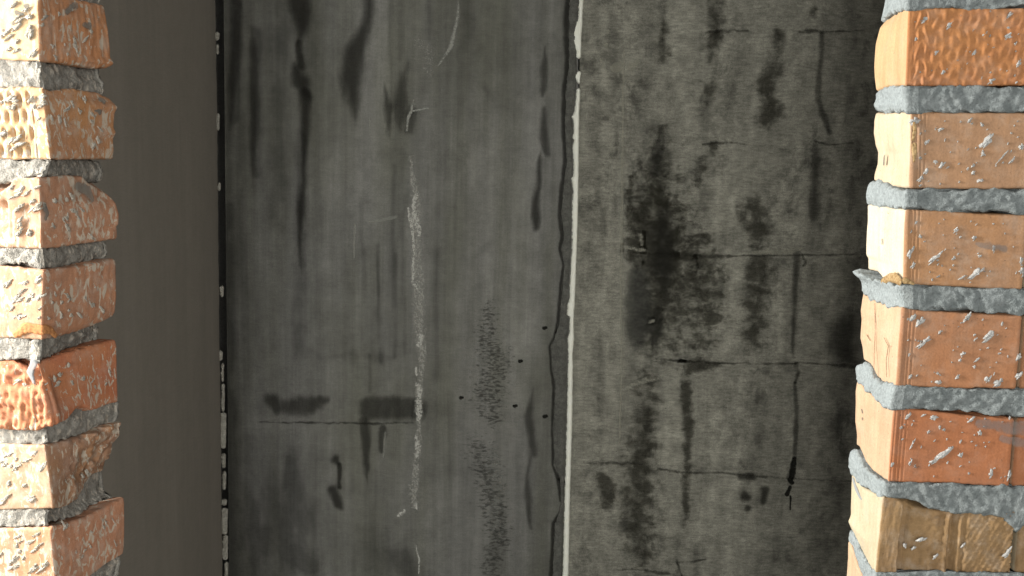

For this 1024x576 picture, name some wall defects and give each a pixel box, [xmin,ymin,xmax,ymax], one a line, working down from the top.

water stain [291,0,310,180]
water stain [344,0,371,108]
water stain [757,63,781,125]
water stain [361,159,426,518]
water stain [627,149,722,513]
water stain [597,375,656,559]